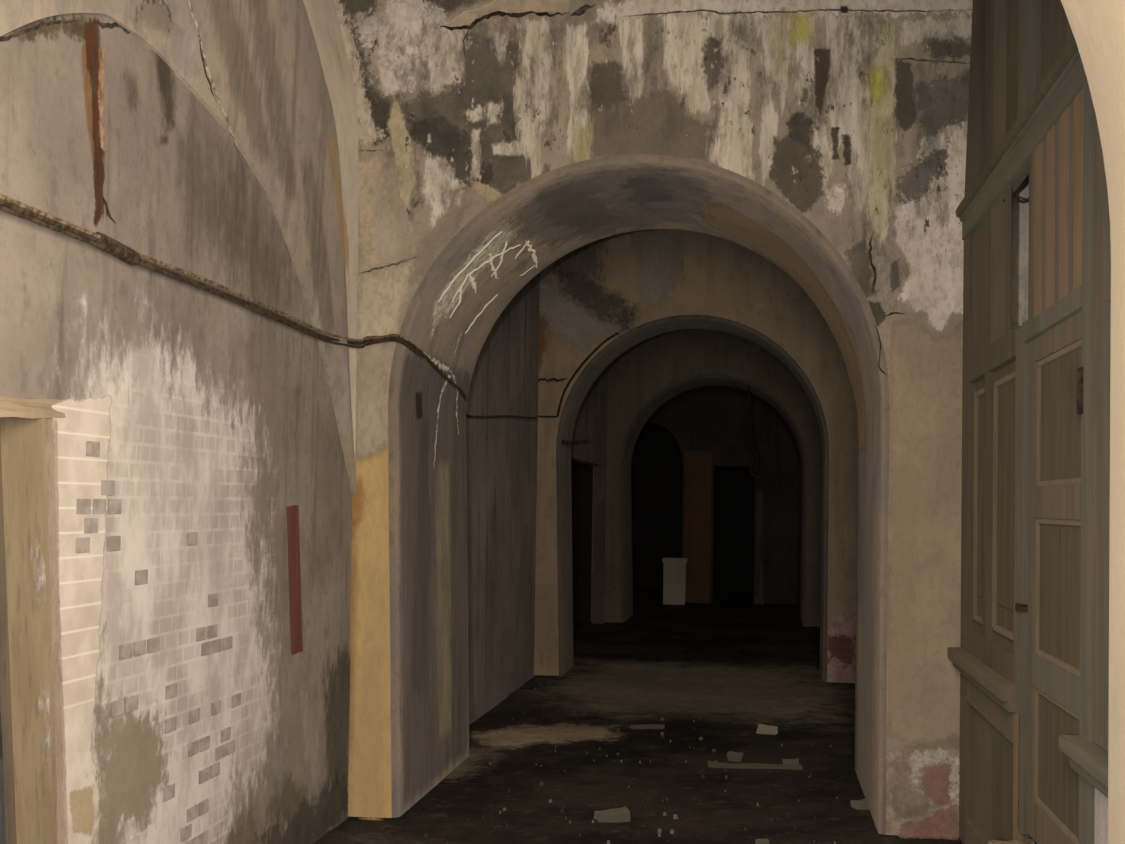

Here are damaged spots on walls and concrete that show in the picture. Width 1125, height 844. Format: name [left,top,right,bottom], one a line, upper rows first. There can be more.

crack [0,15,130,41]
rust [14,16,116,225]
peeling [333,0,549,272]
water stain [426,0,474,10]
crack [440,4,595,56]
water stain [513,0,973,248]
peeling [576,11,972,377]
crack [623,6,972,17]
crack [897,57,970,65]
peeling [1011,175,1029,329]
peeling [37,290,281,844]
water stain [95,697,167,844]